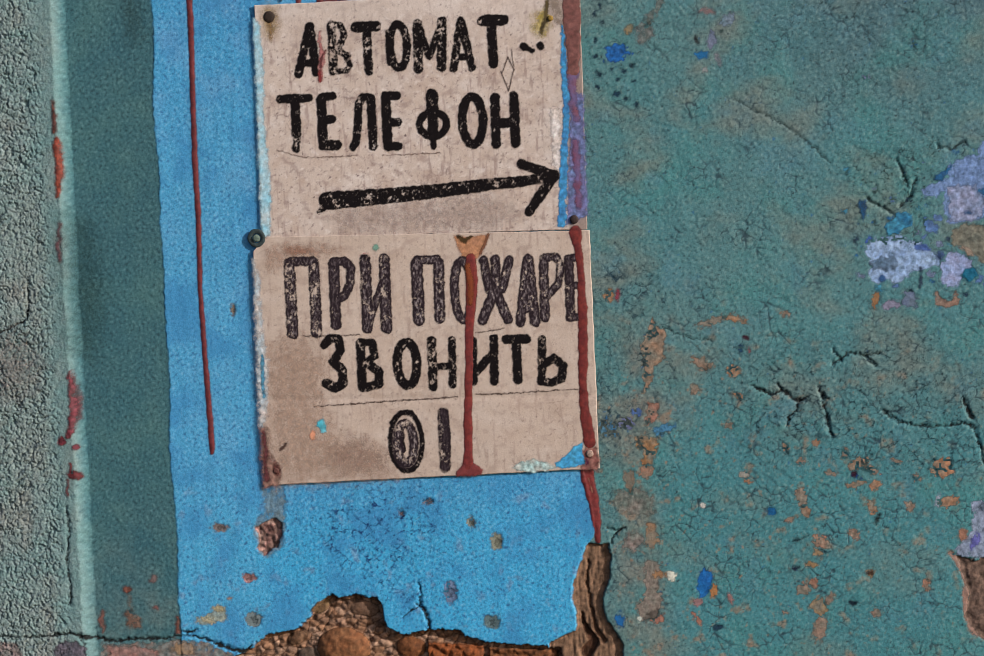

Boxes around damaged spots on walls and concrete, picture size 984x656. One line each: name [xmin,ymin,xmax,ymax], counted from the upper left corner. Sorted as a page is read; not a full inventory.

peeling [841,141,984,310]
crack [0,280,30,333]
rust [58,370,83,450]
rust [66,462,84,497]
spalling [254,486,287,557]
rust [581,446,600,472]
peeling [598,317,676,553]
crack [737,347,984,466]
peeling [840,447,883,523]
spalling [100,543,625,656]
spalling [935,495,984,639]
peeling [54,640,87,656]